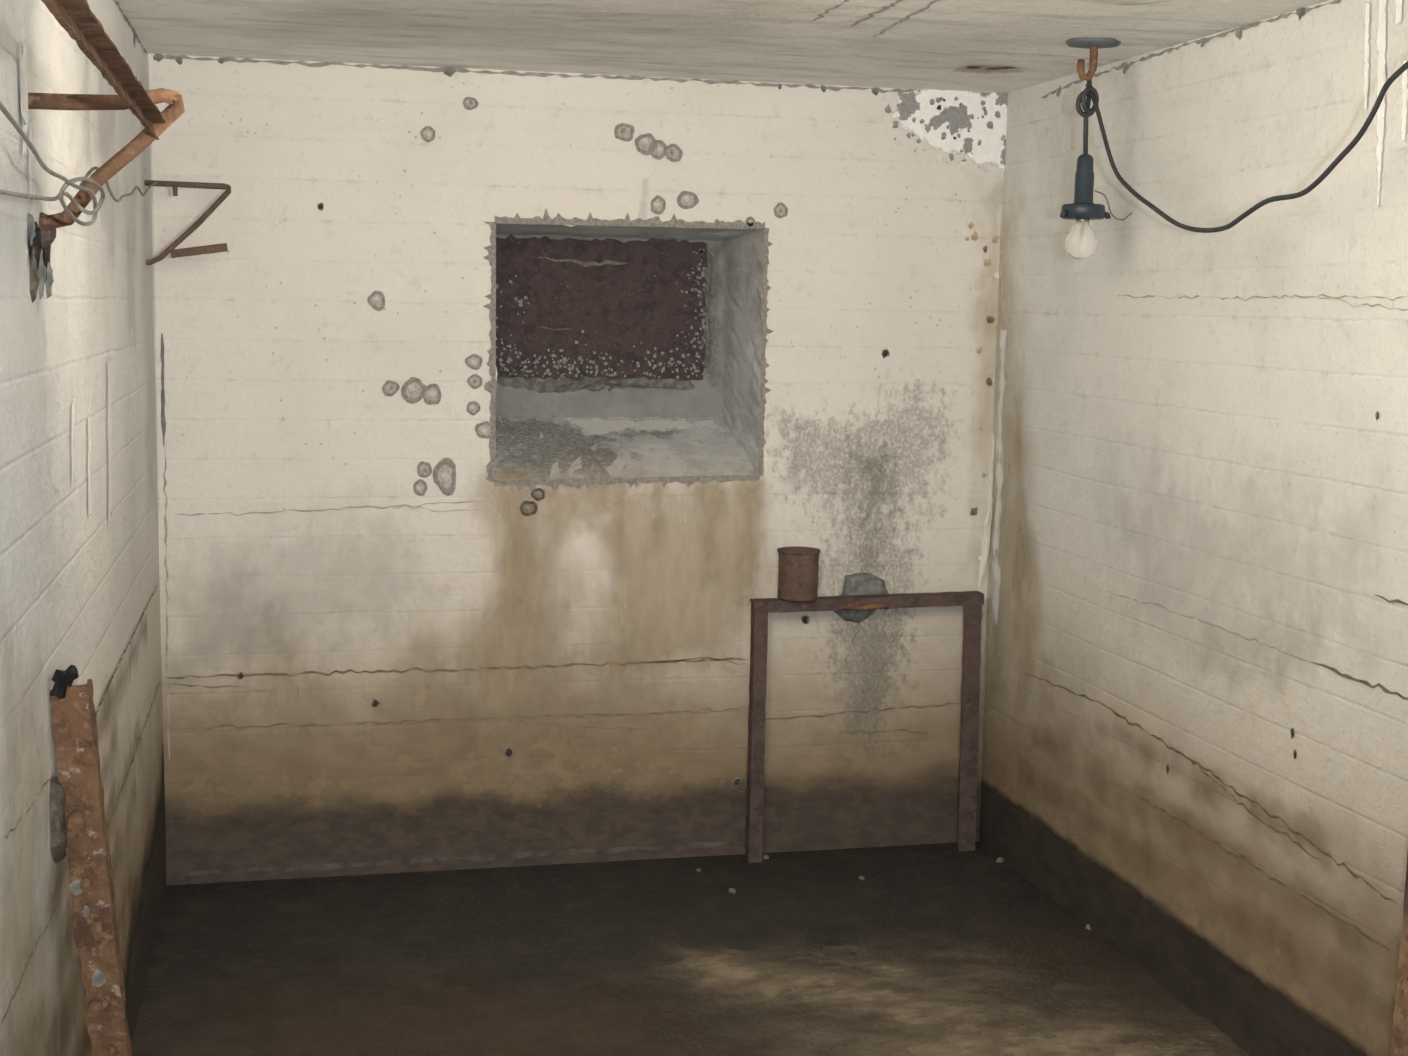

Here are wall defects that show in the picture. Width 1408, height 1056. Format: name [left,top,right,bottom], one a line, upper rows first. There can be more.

crack [114,0,920,96]
crack [813,0,940,38]
peeling [885,89,1008,181]
efflorescence [1363,0,1408,206]
crack [1108,591,1408,700]
damp [117,489,960,1046]
damp [975,733,1393,1056]
crack [1012,667,1396,904]
crack [1108,780,1391,951]